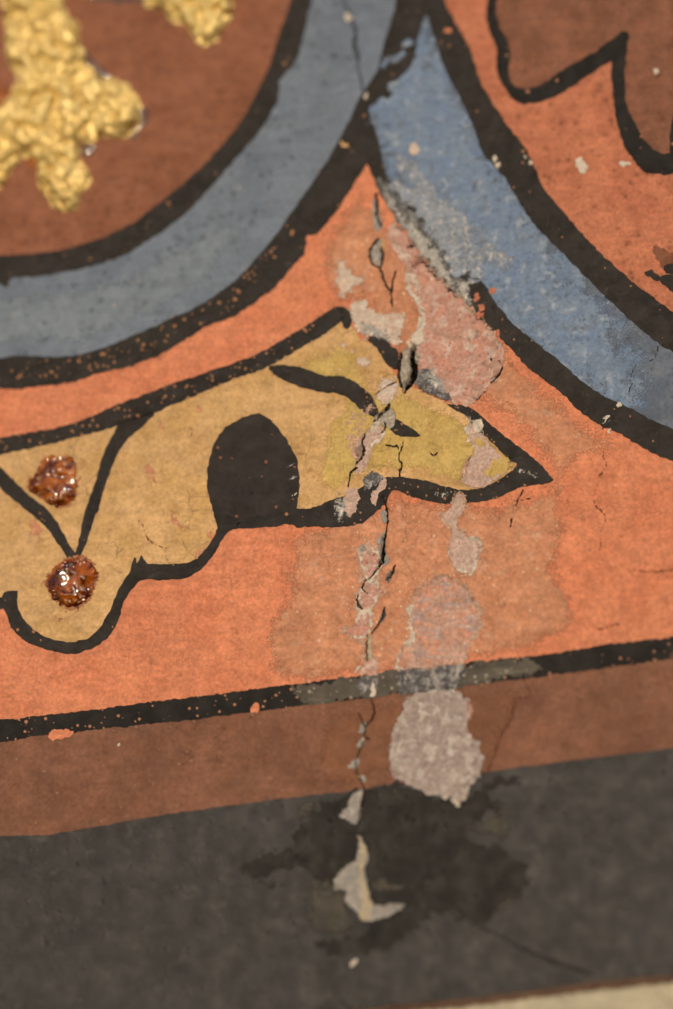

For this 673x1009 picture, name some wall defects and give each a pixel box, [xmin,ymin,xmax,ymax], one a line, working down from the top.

crack [330,0,372,143]
crack [368,193,396,307]
peeling [386,222,507,408]
peeling [352,408,396,476]
crack [347,345,421,662]
peeling [341,536,393,640]
peeling [388,419,512,807]
peeling [354,655,382,697]
peeling [339,721,366,824]
crack [355,698,376,817]
peeling [334,836,406,921]
damp [240,775,532,956]